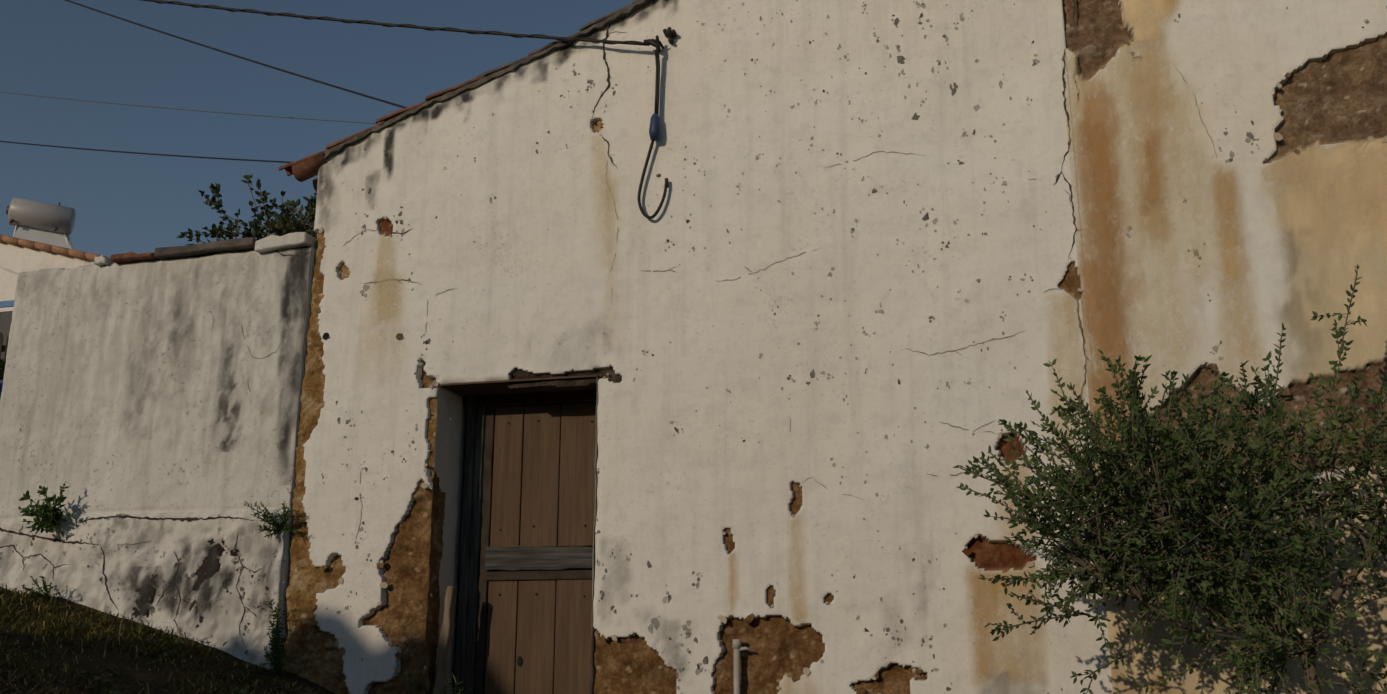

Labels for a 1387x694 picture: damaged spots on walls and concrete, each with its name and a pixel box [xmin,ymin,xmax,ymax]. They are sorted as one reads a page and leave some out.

flaking render [1062,0,1181,81]
crack [1028,0,1091,428]
damp [282,246,309,333]
peeling [1102,19,1387,694]
flaking render [0,229,451,694]
damp [218,382,239,450]
damp [280,424,290,451]
crack [0,514,263,649]
damp [130,545,233,617]
flaking render [955,532,1036,590]
flaking render [593,584,825,694]
flaking render [852,613,947,694]